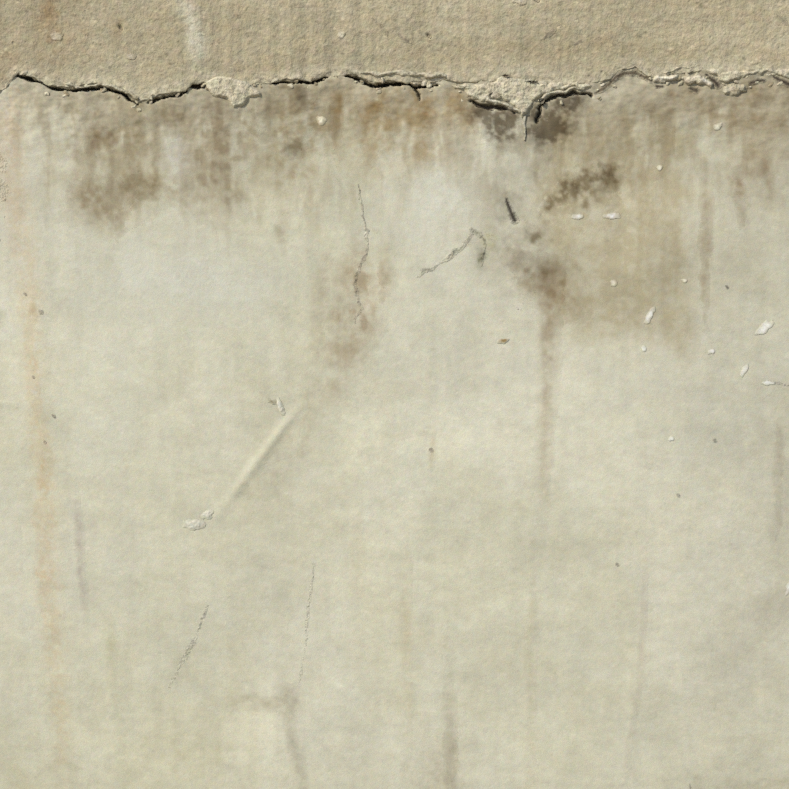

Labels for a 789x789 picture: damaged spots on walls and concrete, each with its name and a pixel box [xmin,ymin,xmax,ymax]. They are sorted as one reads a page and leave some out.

damp [411,28,789,69]
crack [16,75,132,101]
crack [152,83,205,103]
crack [272,75,437,98]
crack [473,100,507,110]
crack [536,69,665,123]
crack [687,73,722,94]
crack [748,75,789,88]
crack [353,185,370,324]
crack [417,227,486,277]
damp [21,72,789,645]
damp [396,529,482,789]